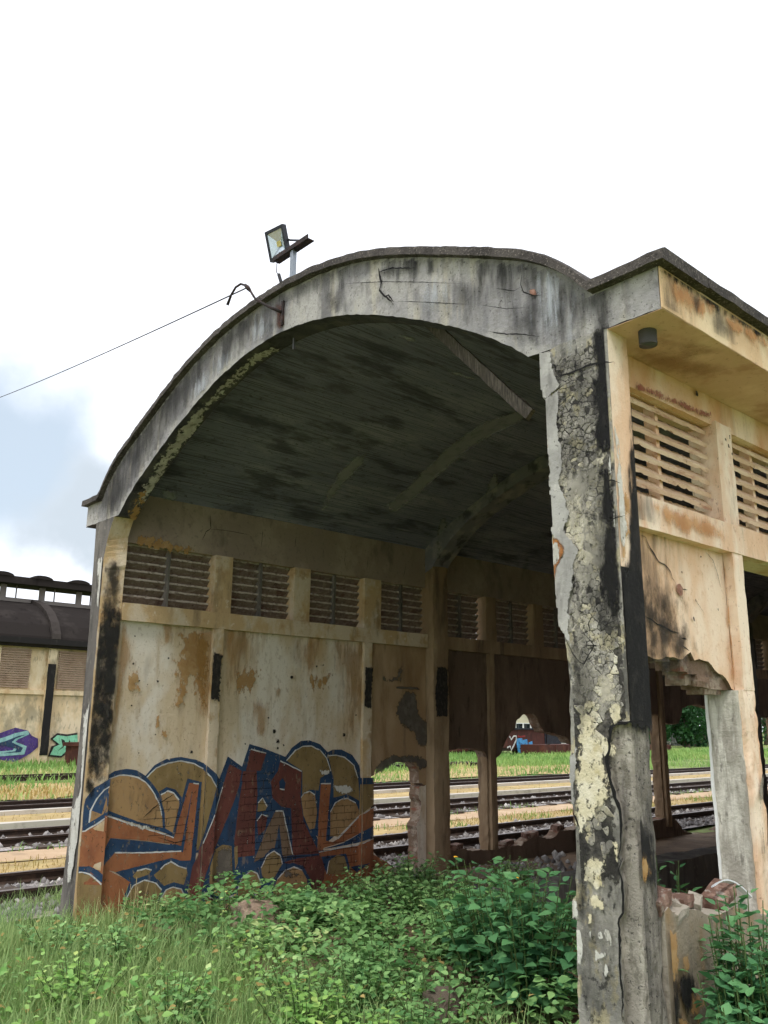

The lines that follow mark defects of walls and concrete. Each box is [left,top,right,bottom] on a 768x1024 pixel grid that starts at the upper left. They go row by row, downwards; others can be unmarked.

crack [361,267,461,304]
peeling [137,347,279,506]
spalling [553,539,563,577]
peeling [609,427,630,560]
water stain [593,325,686,734]
water stain [86,562,121,791]
peeling [168,631,223,709]
crack [484,276,688,1022]
peeling [575,698,616,833]
peeling [609,703,621,724]